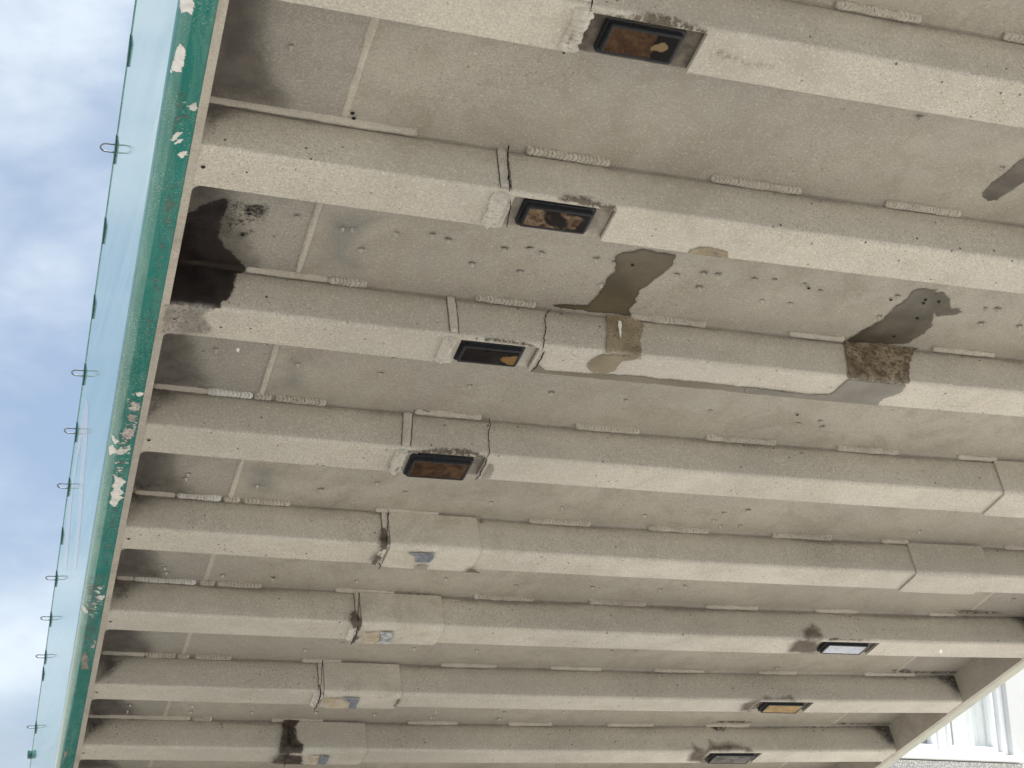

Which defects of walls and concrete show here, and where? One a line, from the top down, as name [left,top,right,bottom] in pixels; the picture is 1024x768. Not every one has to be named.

peeling [170,44,186,73]
peeling [170,132,188,158]
crack [504,145,512,227]
damp [164,199,266,334]
crack [531,308,552,372]
peeling [109,392,144,507]
crack [475,418,491,480]
crack [314,660,323,710]
damp [270,720,303,764]